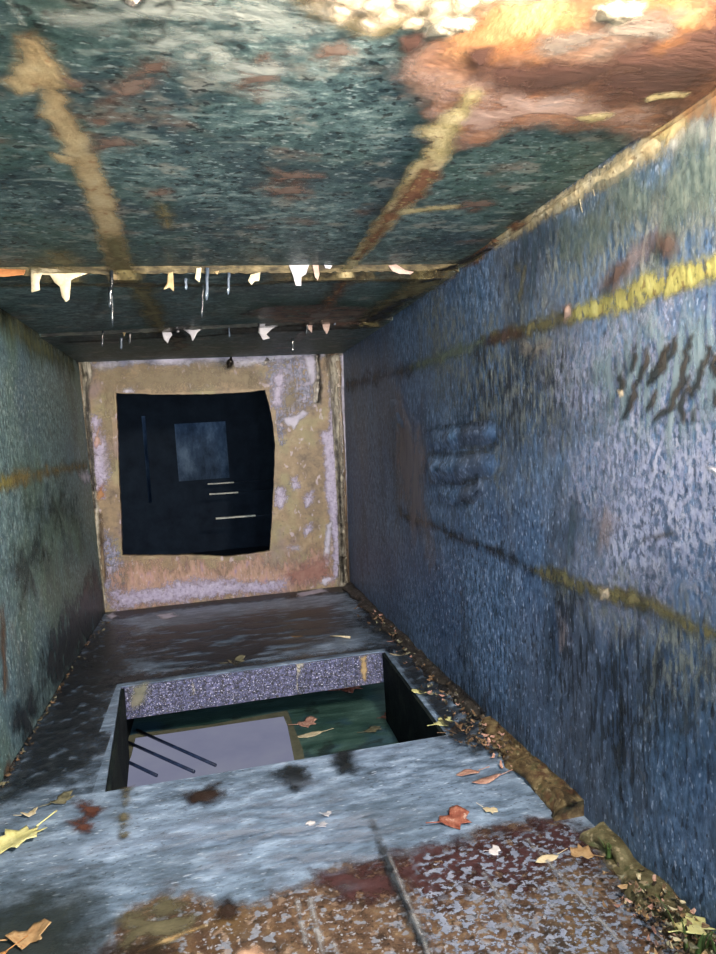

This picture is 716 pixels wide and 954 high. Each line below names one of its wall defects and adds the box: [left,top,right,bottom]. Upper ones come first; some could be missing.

peeling [296,0,495,37]
rust [88,61,167,126]
rust [212,53,289,103]
rust [400,0,716,146]
rust [265,169,324,199]
peeling [31,268,87,302]
peeling [163,272,174,291]
peeling [289,265,332,286]
peeling [162,327,200,343]
peeling [260,323,275,340]
peeling [90,354,339,585]
water stain [0,888,111,954]